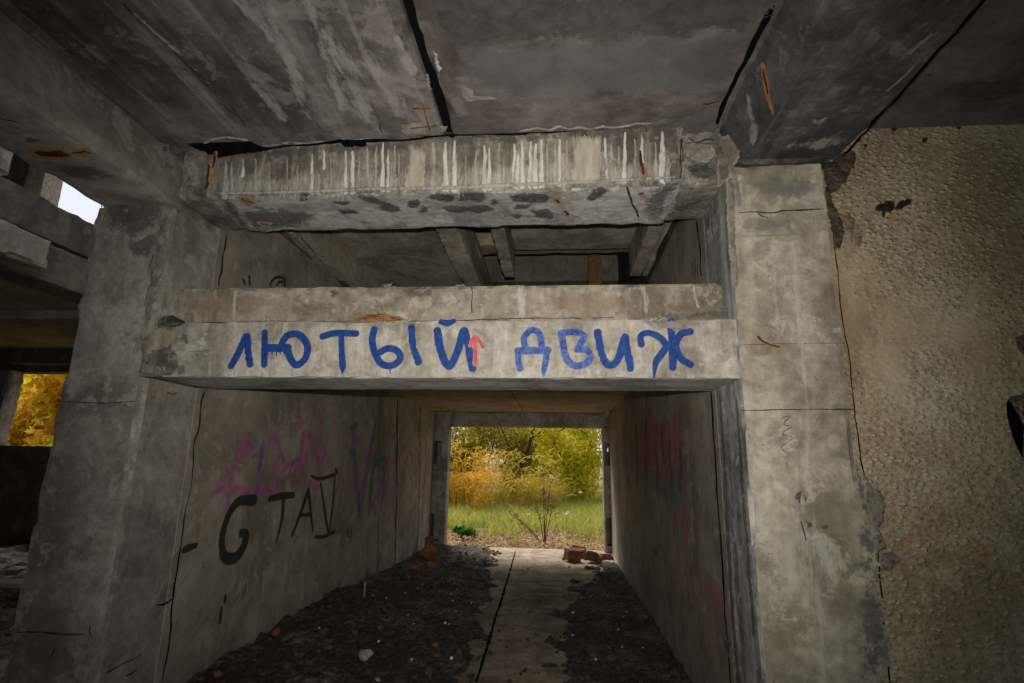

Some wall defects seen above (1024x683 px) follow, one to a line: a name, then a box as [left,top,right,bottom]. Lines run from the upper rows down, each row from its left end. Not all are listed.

crack [186,5,776,190]
corrosion [760,62,774,116]
corrosion [22,146,94,162]
damp [215,131,687,232]
corrosion [635,150,649,200]
crack [739,208,821,218]
peeling [823,139,867,249]
spalling [875,199,912,225]
spalling [356,313,407,322]
crack [742,235,865,475]
crack [105,392,205,680]
crack [475,551,516,682]